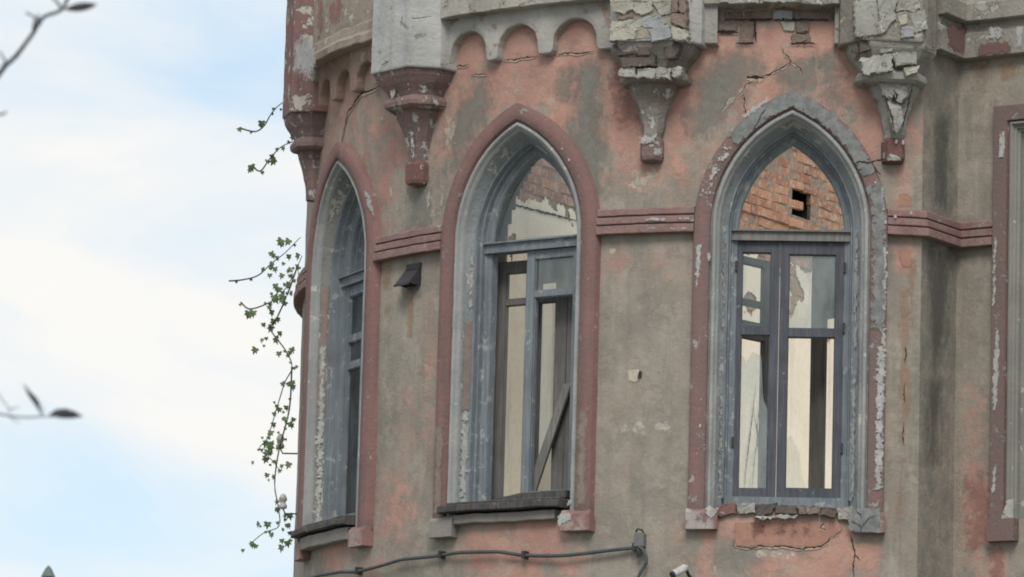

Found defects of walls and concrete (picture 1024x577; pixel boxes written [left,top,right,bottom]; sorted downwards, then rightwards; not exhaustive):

peeling [293,35,316,79]
crack [341,60,388,142]
crack [457,51,594,77]
spalling [609,0,692,82]
crack [717,18,830,129]
spalling [852,0,928,145]
peeling [699,91,897,491]
peeling [314,286,329,522]
peeling [458,247,475,502]
peeling [992,328,1000,411]
crack [733,512,877,576]
peeling [1001,499,1014,518]